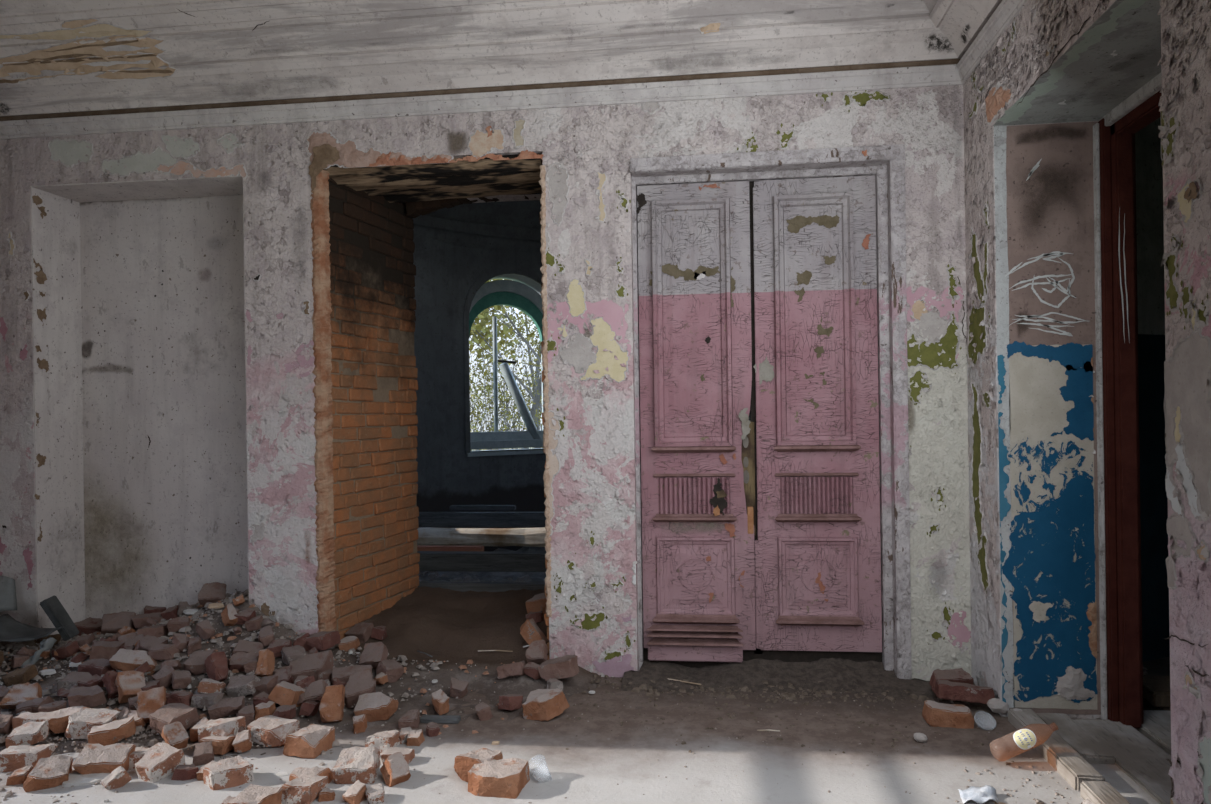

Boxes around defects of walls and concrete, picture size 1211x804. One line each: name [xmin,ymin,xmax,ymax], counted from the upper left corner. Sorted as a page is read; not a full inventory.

peeling [0,18,177,84]
flaking render [284,0,1108,710]
peeling [1158,0,1211,608]